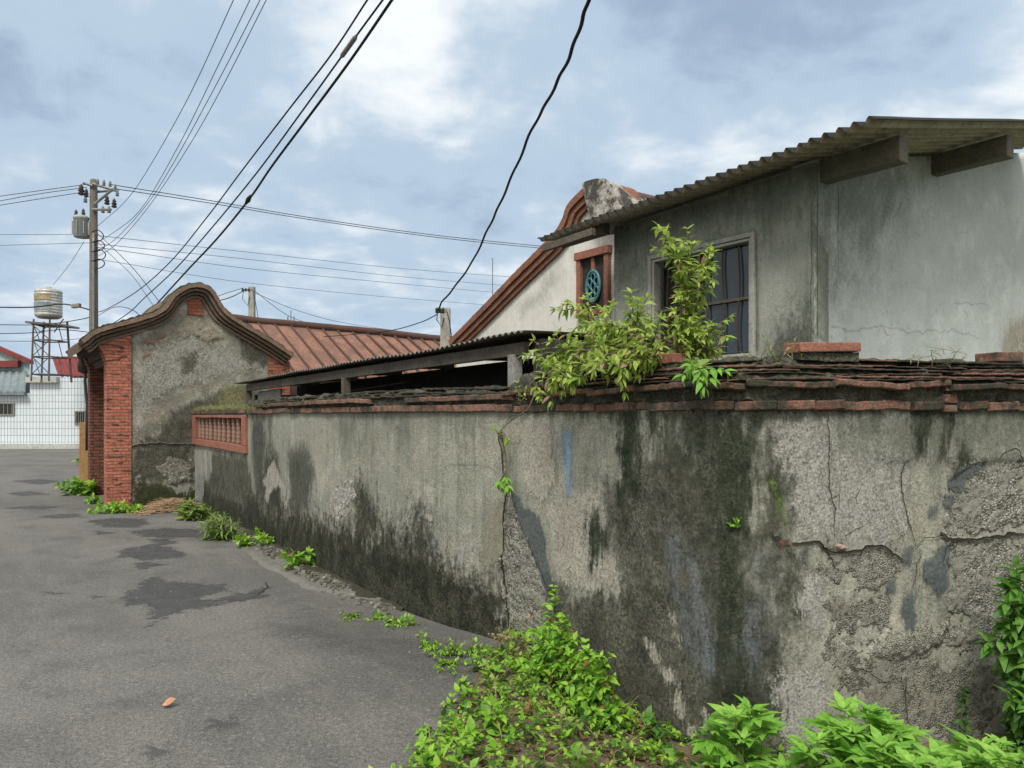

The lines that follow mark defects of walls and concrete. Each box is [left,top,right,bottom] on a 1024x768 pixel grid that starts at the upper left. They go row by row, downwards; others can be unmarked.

spalling [153,456,195,486]
leakage [178,351,198,374]
leakage [239,338,267,367]
leakage [131,385,510,641]
crack [496,414,517,636]
peeling [495,416,621,648]
leakage [525,410,1024,760]
peeling [767,410,1024,757]
crack [792,412,1024,585]